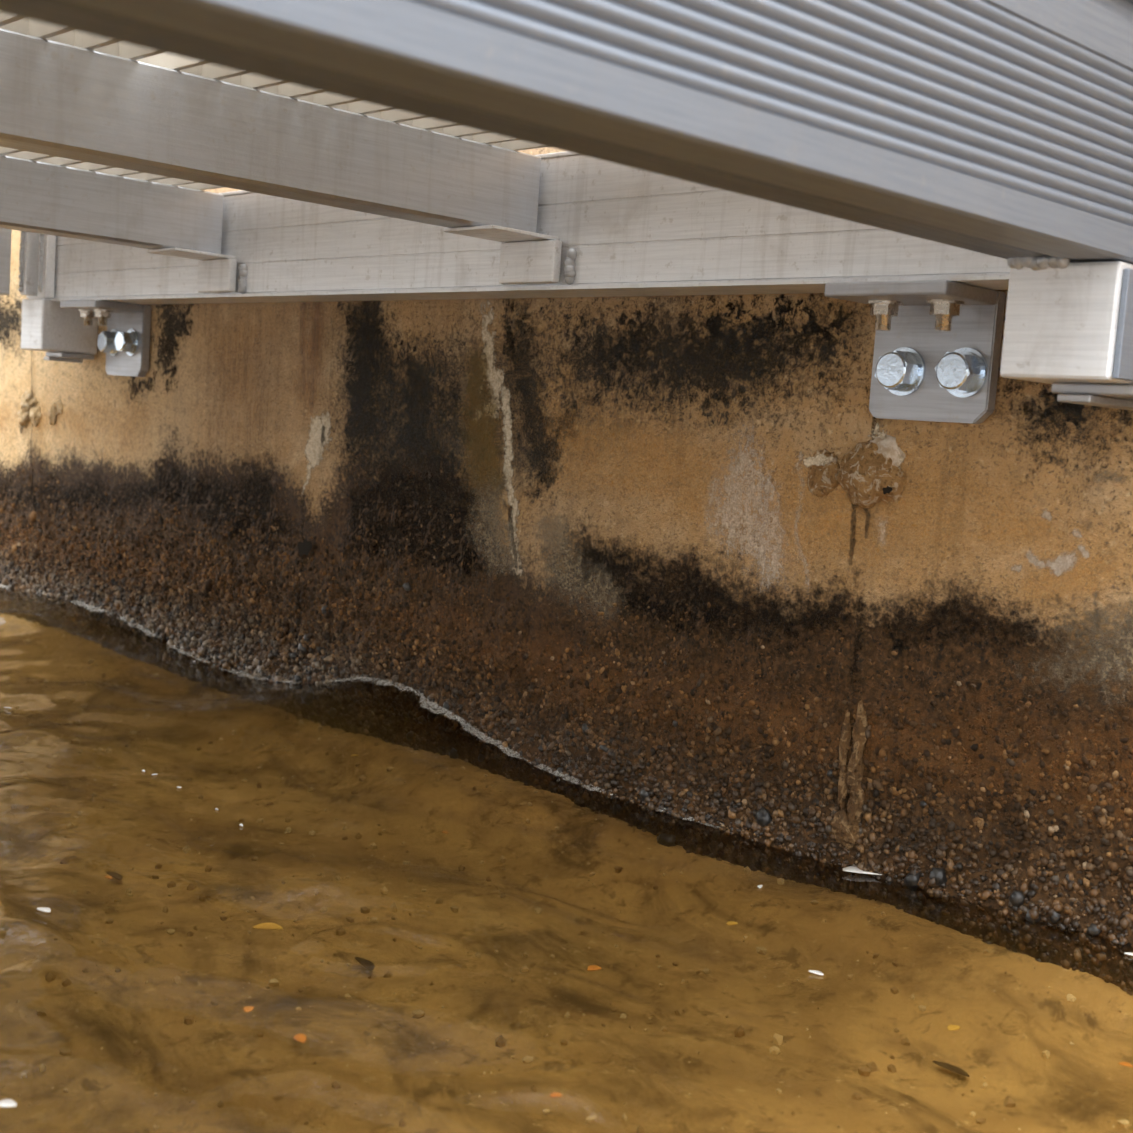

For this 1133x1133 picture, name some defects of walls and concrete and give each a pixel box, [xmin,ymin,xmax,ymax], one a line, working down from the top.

spalling [17,390,63,428]
peeling [302,412,331,495]
peeling [803,454,833,467]
peeling [868,424,906,467]
damp [0,298,1133,991]
spalling [0,460,1133,996]